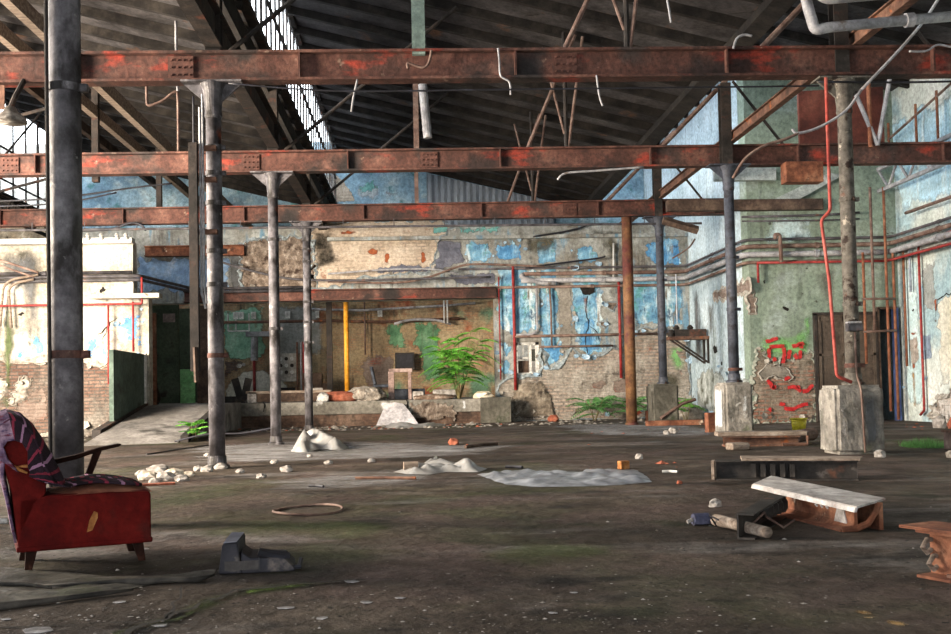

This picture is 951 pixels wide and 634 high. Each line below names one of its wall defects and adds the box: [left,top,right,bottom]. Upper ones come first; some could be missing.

water stain [4,311,13,381]
water stain [5,254,37,318]
spalling [0,336,48,437]
spalling [83,308,144,436]
peeling [137,256,207,293]
spalling [223,220,729,421]
peeling [902,262,951,423]